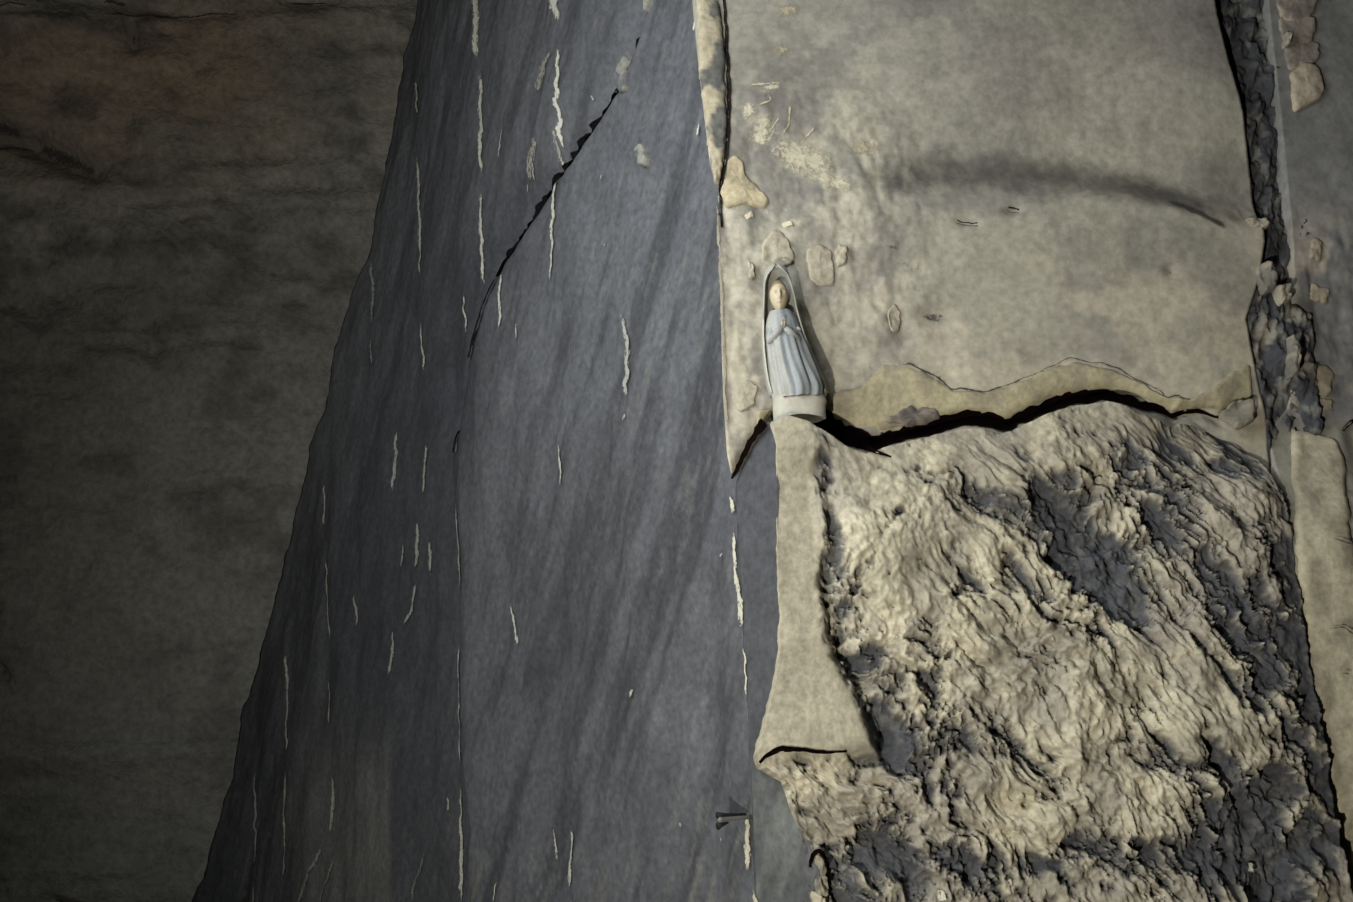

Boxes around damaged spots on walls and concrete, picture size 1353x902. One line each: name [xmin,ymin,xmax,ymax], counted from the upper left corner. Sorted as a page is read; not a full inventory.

flaking render [1276,0,1325,112]
crack [467,37,640,358]
flaking render [1310,283,1330,304]
crack [731,414,773,479]
crack [813,389,1219,458]
spalling [735,357,1353,902]
crack [759,746,847,764]